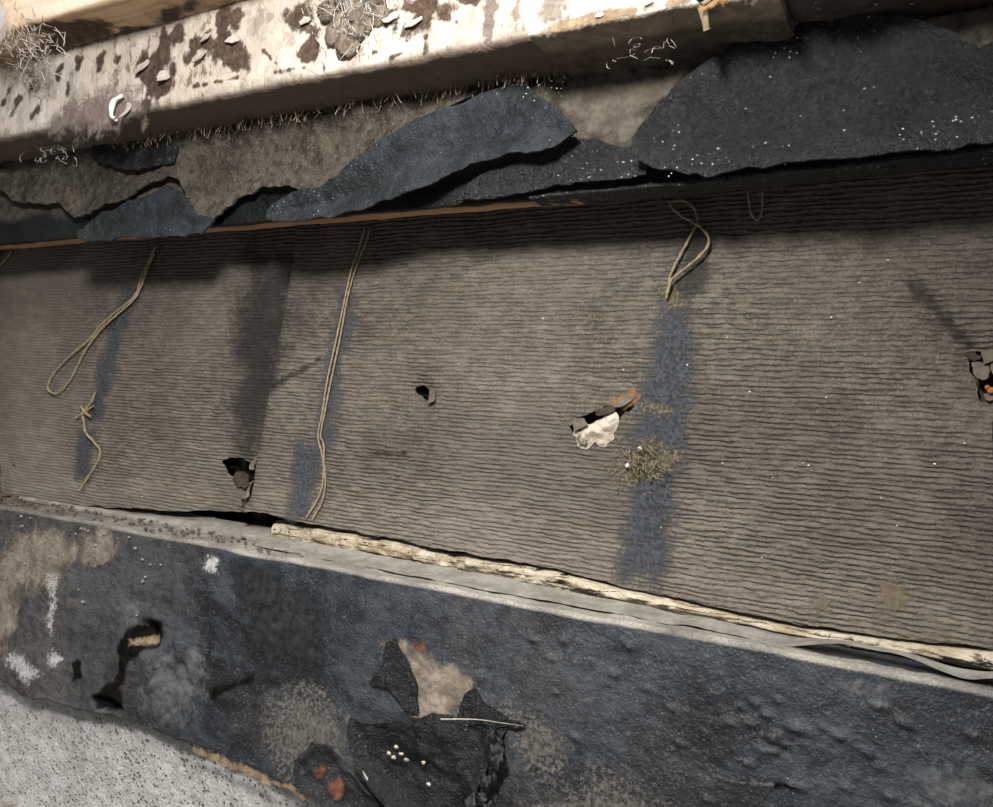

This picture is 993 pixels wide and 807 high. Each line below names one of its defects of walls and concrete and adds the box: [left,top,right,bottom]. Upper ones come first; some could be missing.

peeling [283,0,320,63]
peeling [374,0,480,41]
peeling [548,0,691,32]
peeling [116,5,250,132]
leakage [610,237,707,595]
peeling [203,555,219,573]
rust [314,765,344,801]